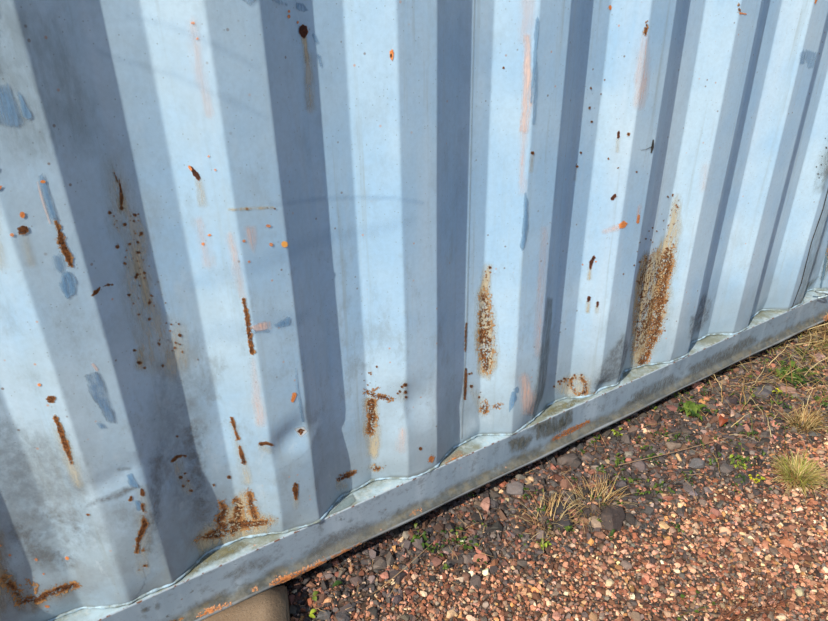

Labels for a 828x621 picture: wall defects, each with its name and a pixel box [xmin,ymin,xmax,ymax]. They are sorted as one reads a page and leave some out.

corrosion [54,219,74,267]
corrosion [108,172,183,372]
corrosion [631,194,679,366]
corrosion [241,298,256,355]
corrosion [463,266,497,400]
corrosion [553,374,595,396]
corrosion [53,414,78,484]
corrosion [127,474,149,554]
corrosion [194,417,272,551]